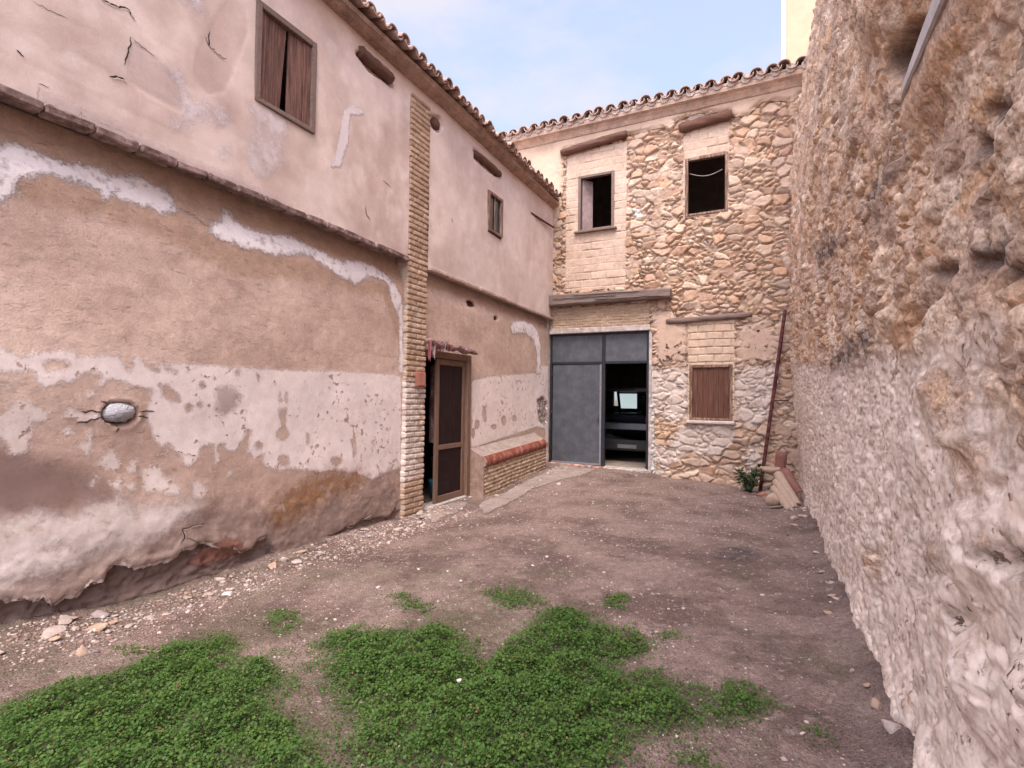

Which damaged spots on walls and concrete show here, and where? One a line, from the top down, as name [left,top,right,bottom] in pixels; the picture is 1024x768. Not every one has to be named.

crack [103,0,154,83]
crack [206,33,227,60]
peeling [0,347,402,501]
peeling [471,366,549,463]
spalling [338,509,399,533]
spalling [0,536,272,623]